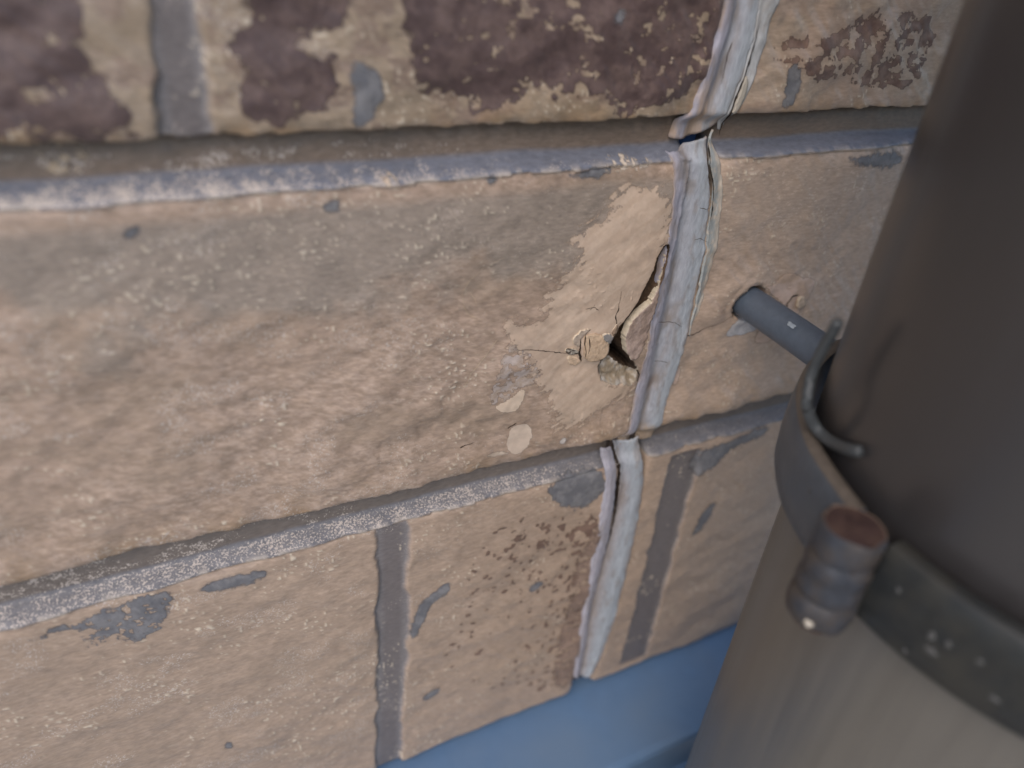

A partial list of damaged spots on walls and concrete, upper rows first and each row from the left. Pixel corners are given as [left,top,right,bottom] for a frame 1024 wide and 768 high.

peeling [0,0,137,143]
peeling [226,0,384,128]
peeling [399,0,724,118]
peeling [777,8,936,108]
peeling [490,182,673,444]
crack [519,244,729,382]